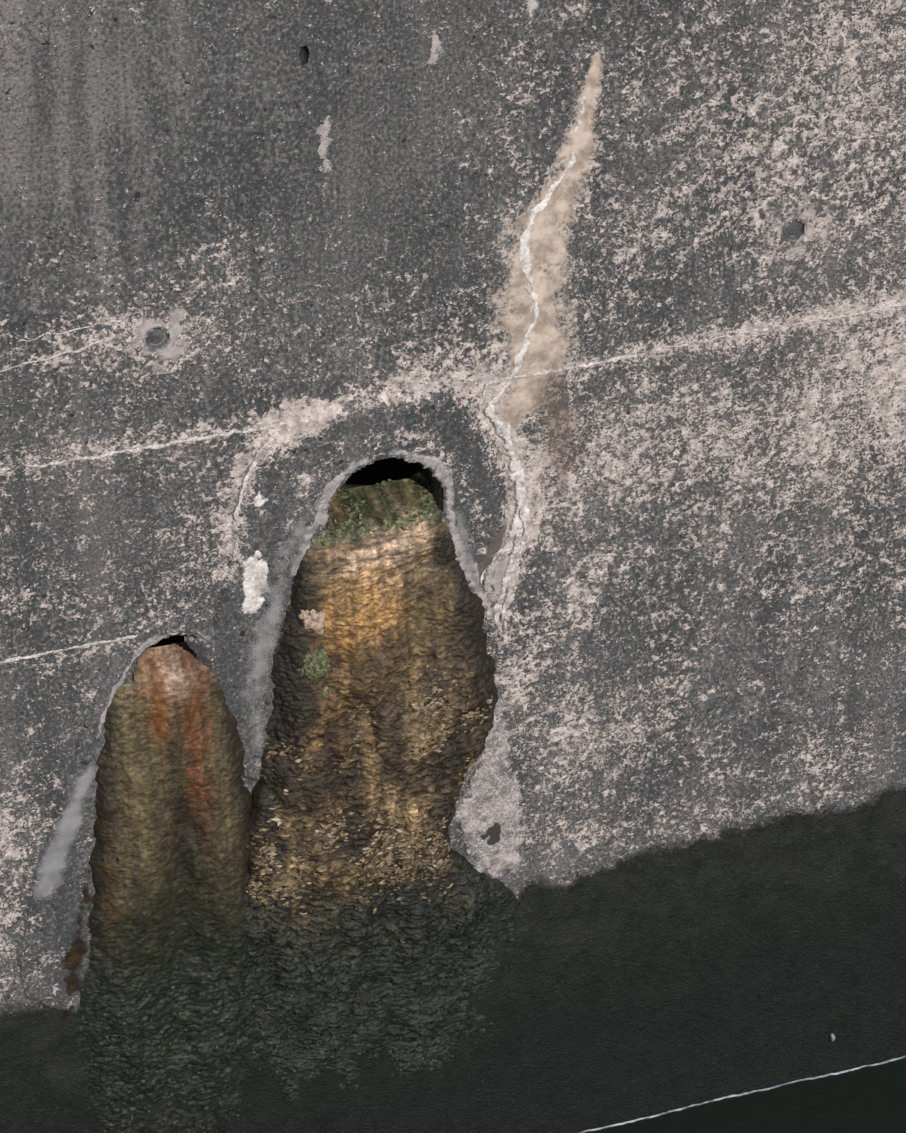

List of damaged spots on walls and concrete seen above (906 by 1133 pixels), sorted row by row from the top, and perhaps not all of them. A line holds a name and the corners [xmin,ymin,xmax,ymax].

water stain [234,432,283,524]
crack [480,92,586,654]
water stain [489,52,603,434]
water stain [0,472,906,1133]